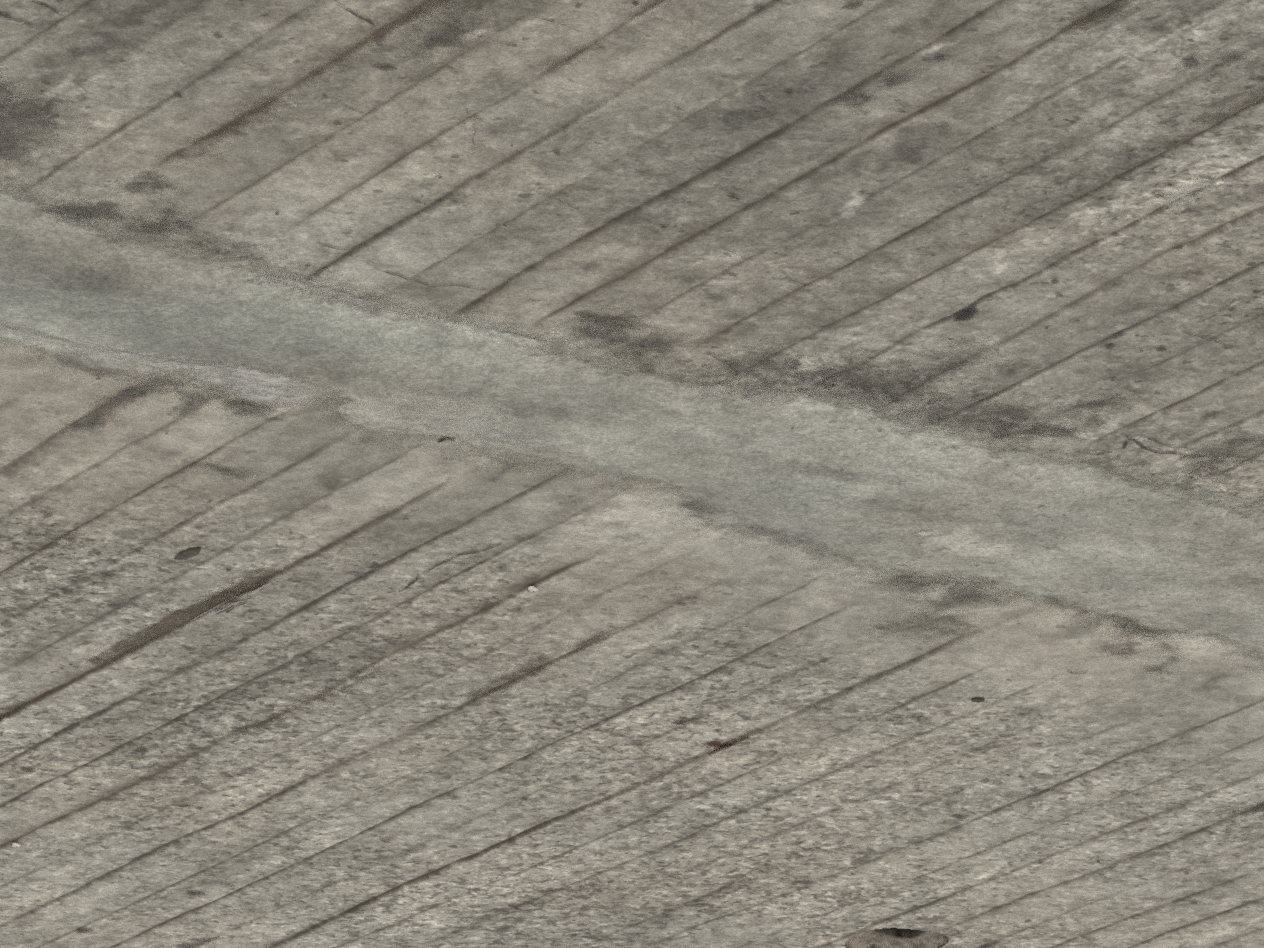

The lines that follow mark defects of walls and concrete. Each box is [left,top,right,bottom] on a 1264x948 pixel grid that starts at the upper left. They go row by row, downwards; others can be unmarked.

spalling [844,928,948,948]